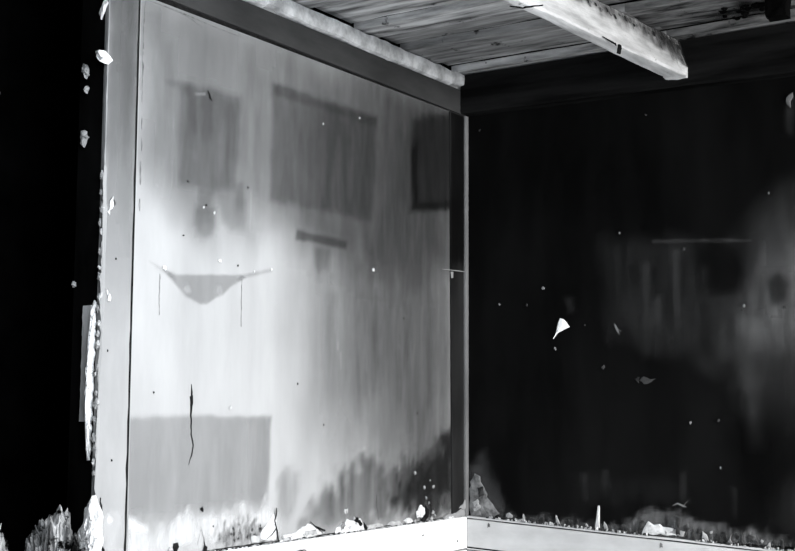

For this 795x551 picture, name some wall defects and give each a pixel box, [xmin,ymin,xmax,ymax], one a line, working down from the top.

flaking render [76,165,116,551]
crack [187,384,195,463]
water stain [394,436,452,515]